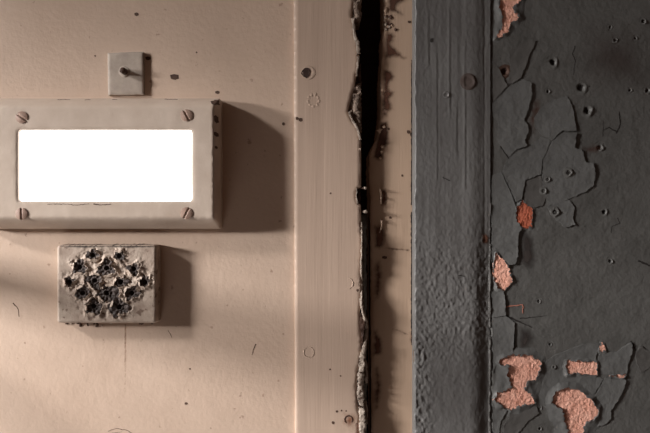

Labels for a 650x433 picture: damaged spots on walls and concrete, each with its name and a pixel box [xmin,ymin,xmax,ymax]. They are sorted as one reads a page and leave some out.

peeling [490,0,527,43]
peeling [491,61,650,433]
crack [506,315,542,328]